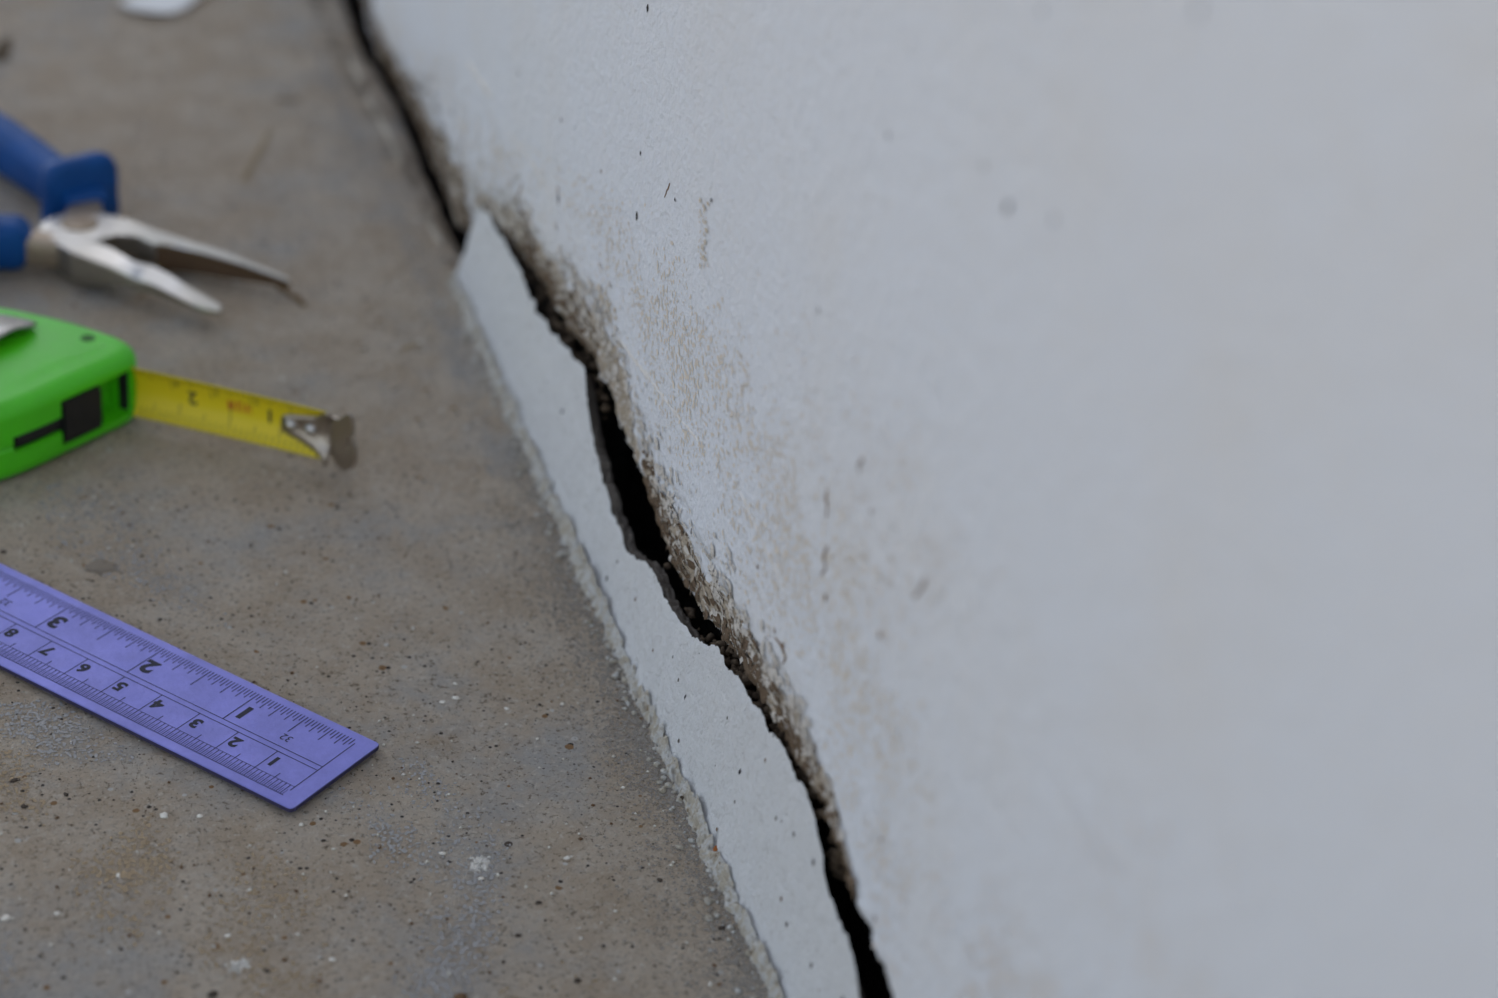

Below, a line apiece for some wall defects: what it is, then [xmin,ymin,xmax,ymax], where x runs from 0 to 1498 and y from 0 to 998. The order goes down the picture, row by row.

crack [345,0,469,257]
flaking render [372,0,855,887]
crack [511,182,789,748]
crack [820,489,828,576]
crack [804,787,894,998]